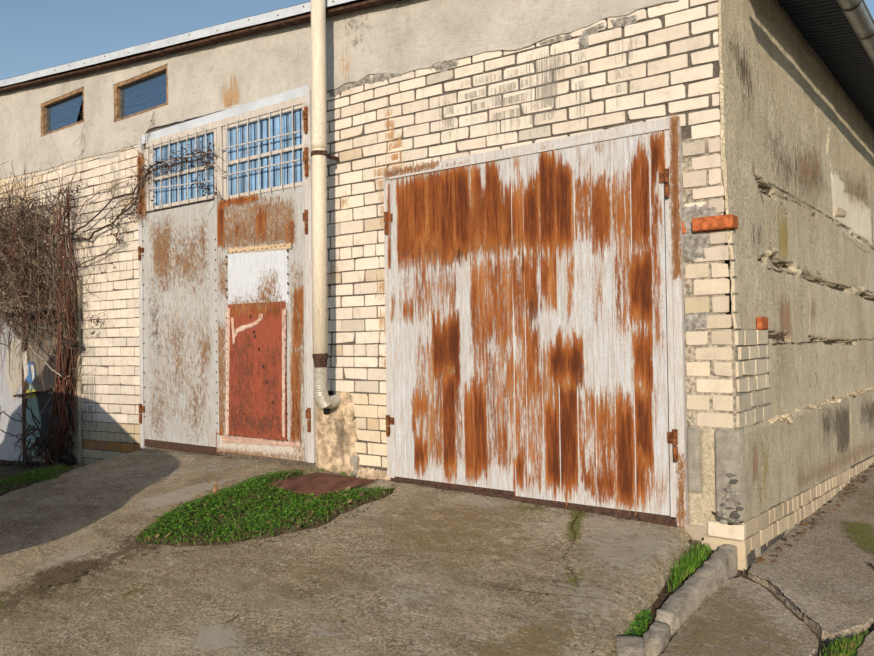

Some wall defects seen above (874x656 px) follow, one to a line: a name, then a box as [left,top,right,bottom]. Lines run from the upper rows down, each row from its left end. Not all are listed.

peeling [539,15,638,49]
rust [221,76,240,108]
peeling [330,73,401,97]
peeling [430,59,458,73]
crack [753,166,874,253]
crack [757,255,874,302]
rust [136,149,305,461]
rust [374,110,687,529]
crack [769,331,874,383]